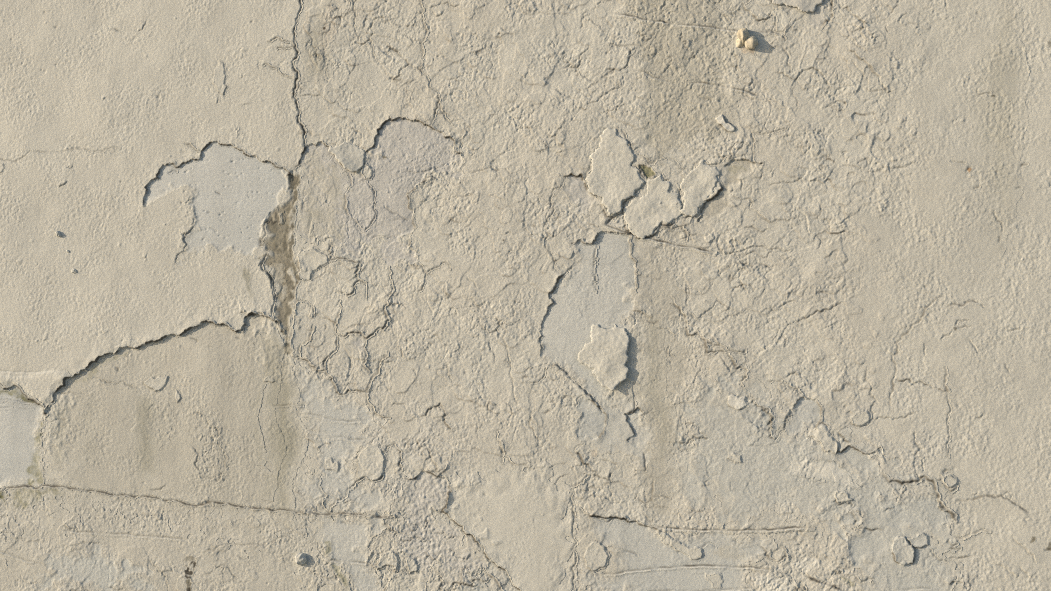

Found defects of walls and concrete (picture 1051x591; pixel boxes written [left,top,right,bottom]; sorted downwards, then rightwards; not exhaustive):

crack [262,0,357,153]
crack [352,0,513,176]
crack [562,13,633,94]
crack [327,242,479,300]
crack [543,177,573,296]
crack [646,123,811,358]
crack [381,443,403,472]
crack [391,401,457,473]
peeling [0,114,970,591]
crack [775,300,843,378]
crack [863,294,987,474]
crack [569,489,578,591]